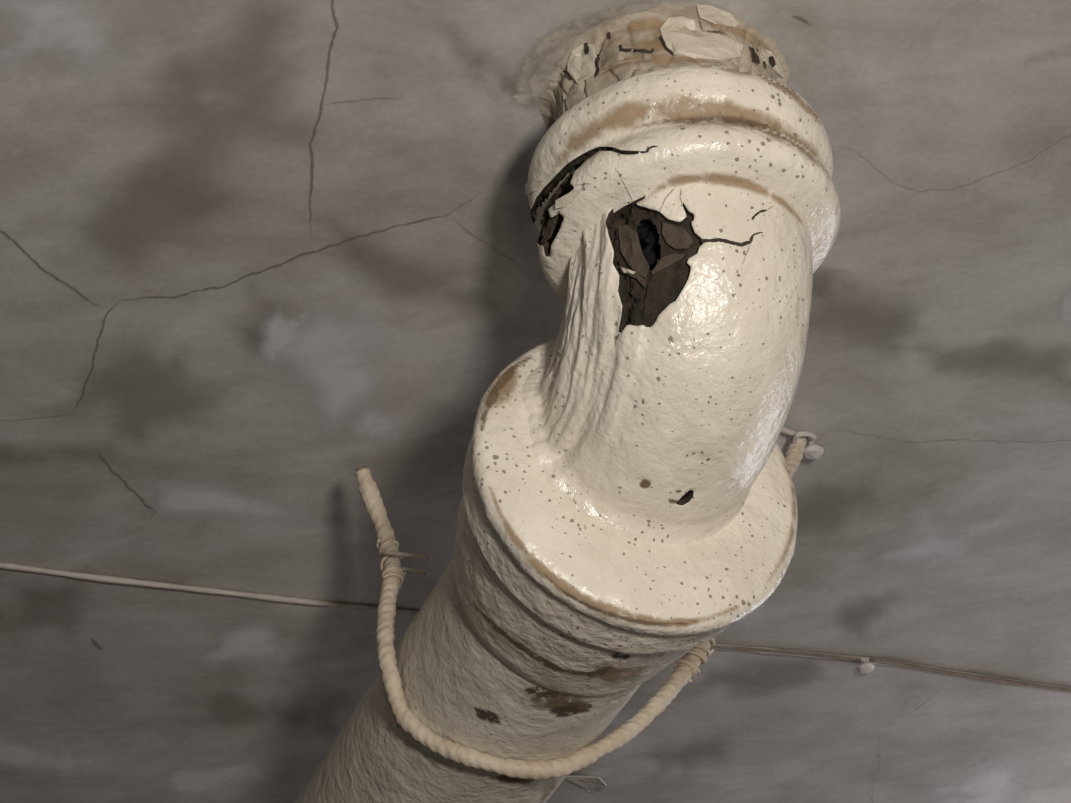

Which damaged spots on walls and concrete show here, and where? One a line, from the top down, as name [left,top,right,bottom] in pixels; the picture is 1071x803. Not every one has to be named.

peeling [660,4,744,61]
peeling [567,43,652,83]
peeling [757,47,784,78]
crack [310,0,339,215]
crack [143,216,440,298]
peeling [620,266,647,288]
water stain [812,276,828,289]
crack [1,231,113,403]